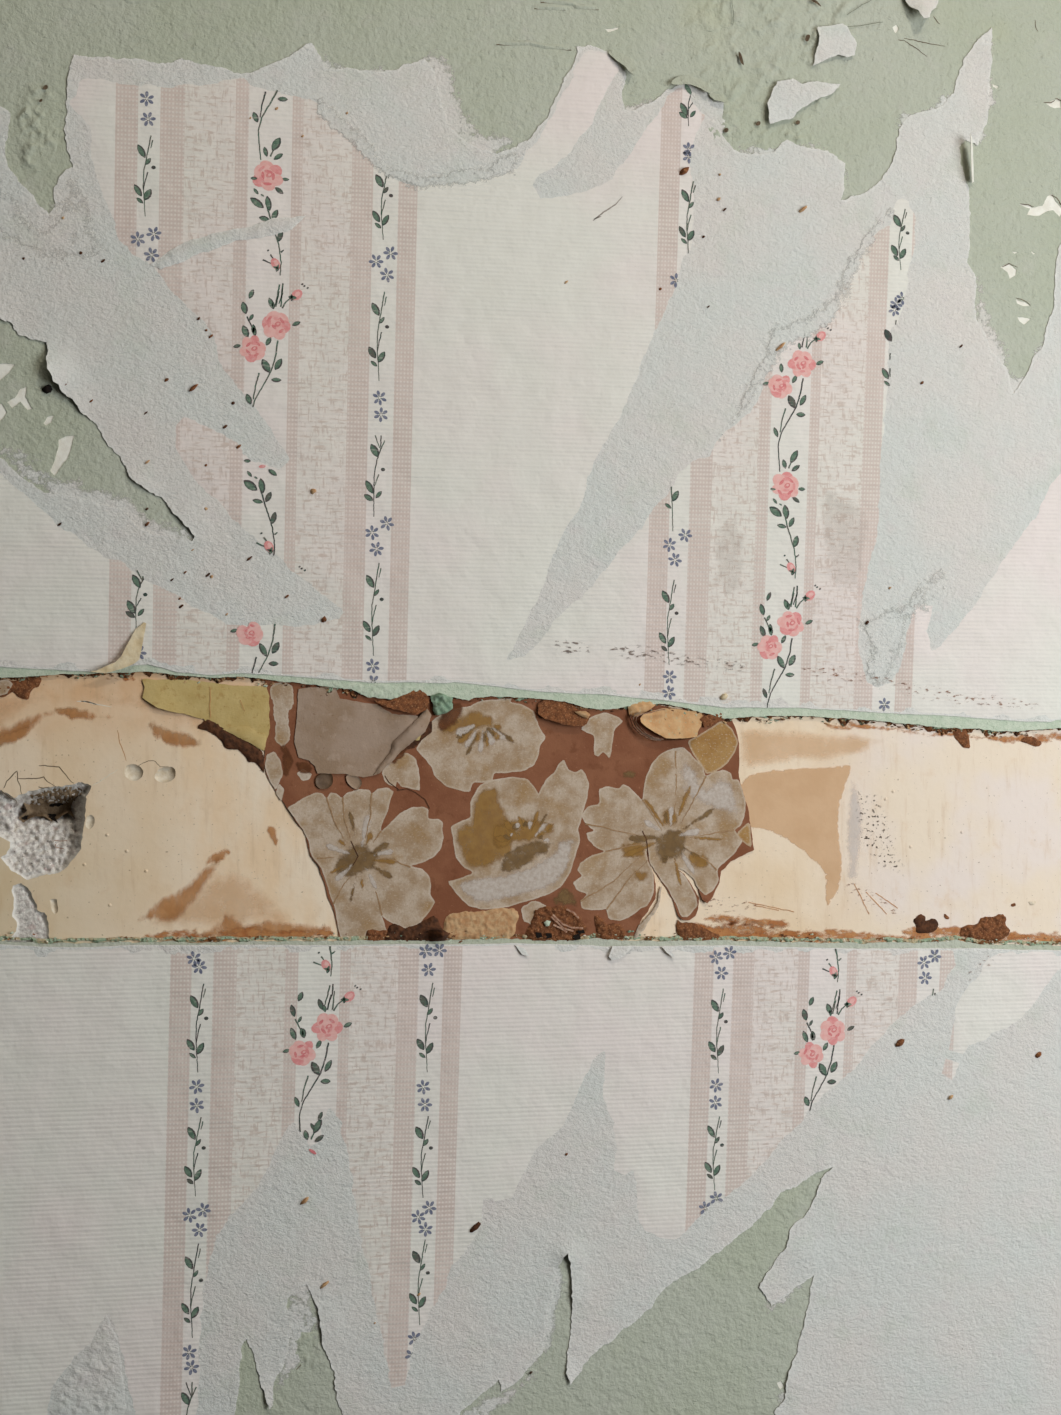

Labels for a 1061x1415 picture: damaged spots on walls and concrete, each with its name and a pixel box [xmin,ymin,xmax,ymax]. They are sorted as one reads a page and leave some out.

peeling [1019,194,1061,217]
peeling [1001,251,1036,278]
peeling [0,363,15,380]
peeling [0,387,32,421]
peeling [50,436,75,476]
peeling [332,682,415,700]
damp [56,708,94,718]
damp [0,717,38,745]
damp [153,726,196,746]
damp [741,736,897,904]
spalling [0,782,91,944]
damp [146,850,333,943]